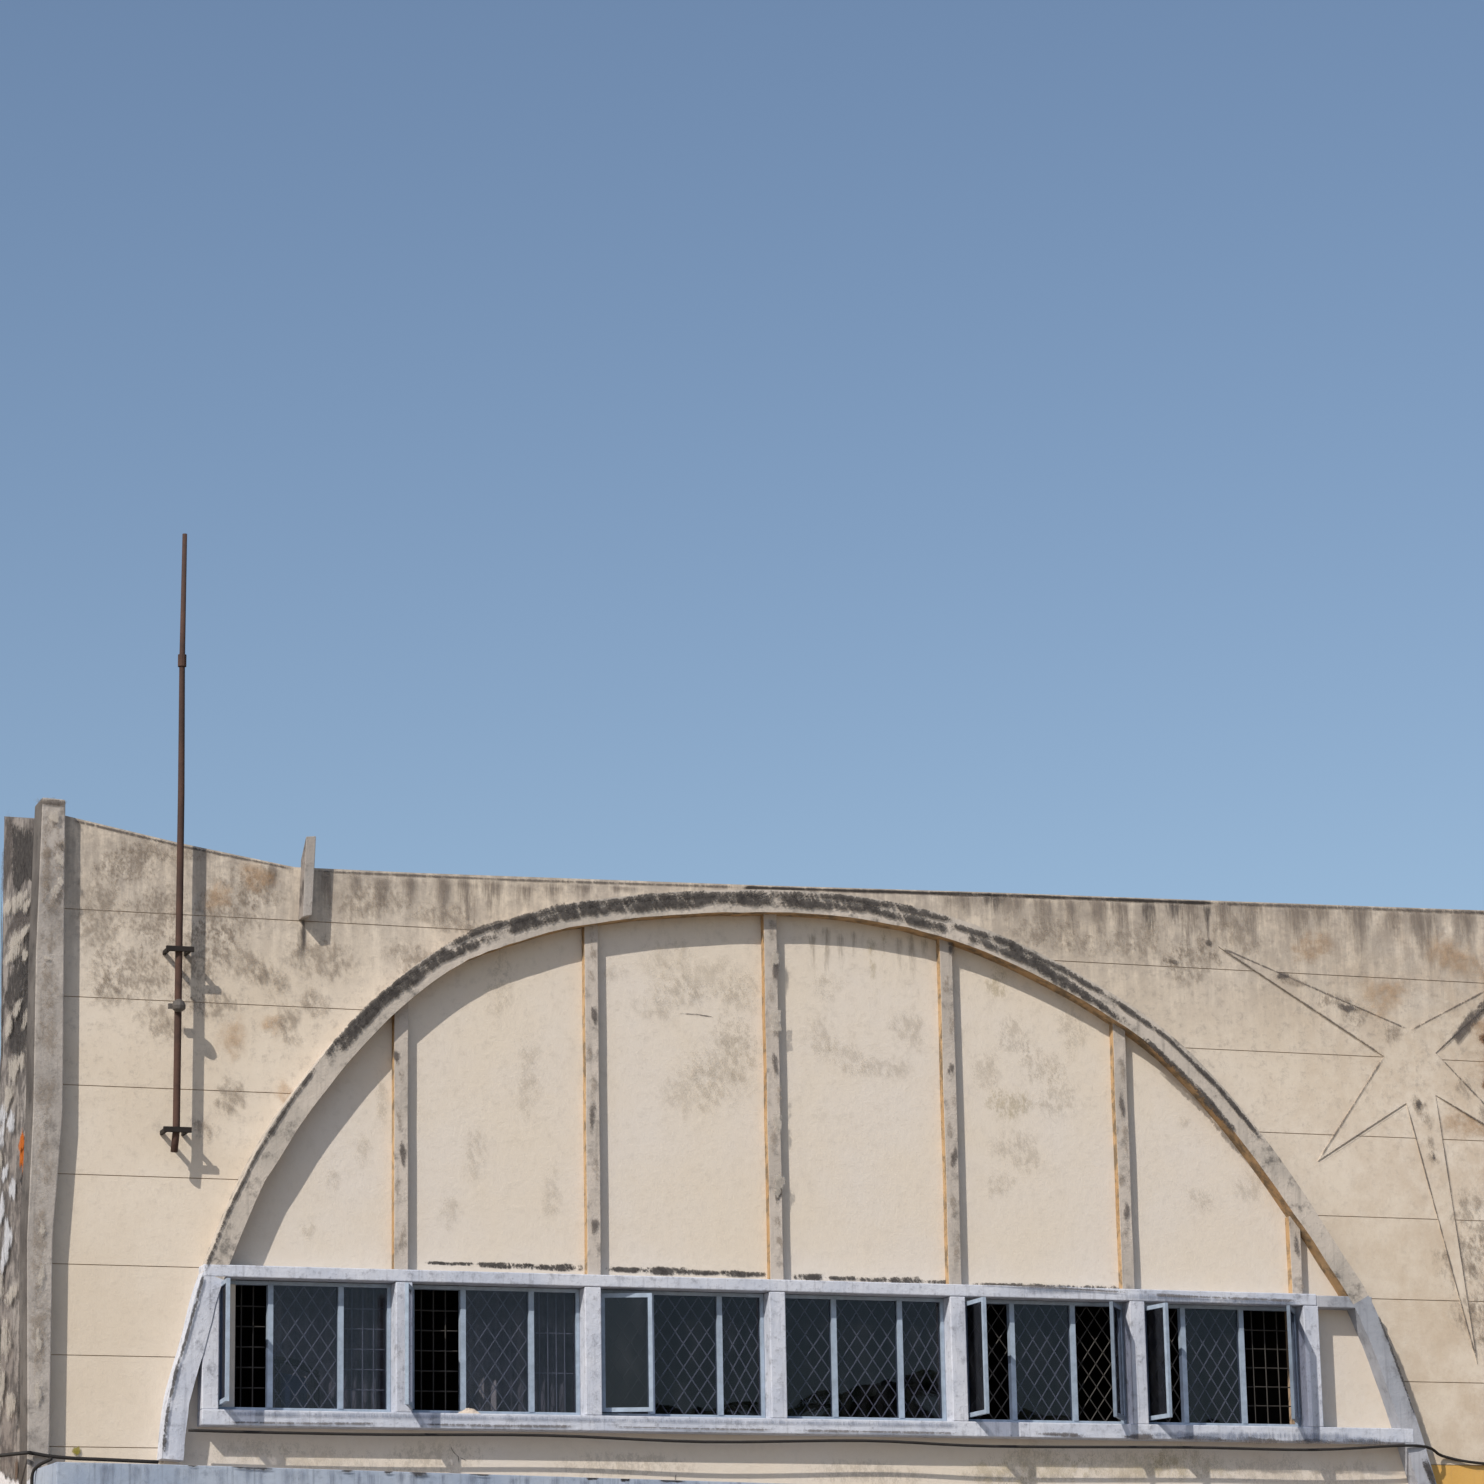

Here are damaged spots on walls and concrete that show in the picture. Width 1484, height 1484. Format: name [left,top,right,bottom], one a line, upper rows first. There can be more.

spalling [51,853,64,898]
water stain [78,821,286,884]
spalling [3,889,51,965]
spalling [5,999,27,1038]
water stain [162,871,1484,1452]
peeling [0,1051,24,1417]
water stain [1422,1459,1435,1484]